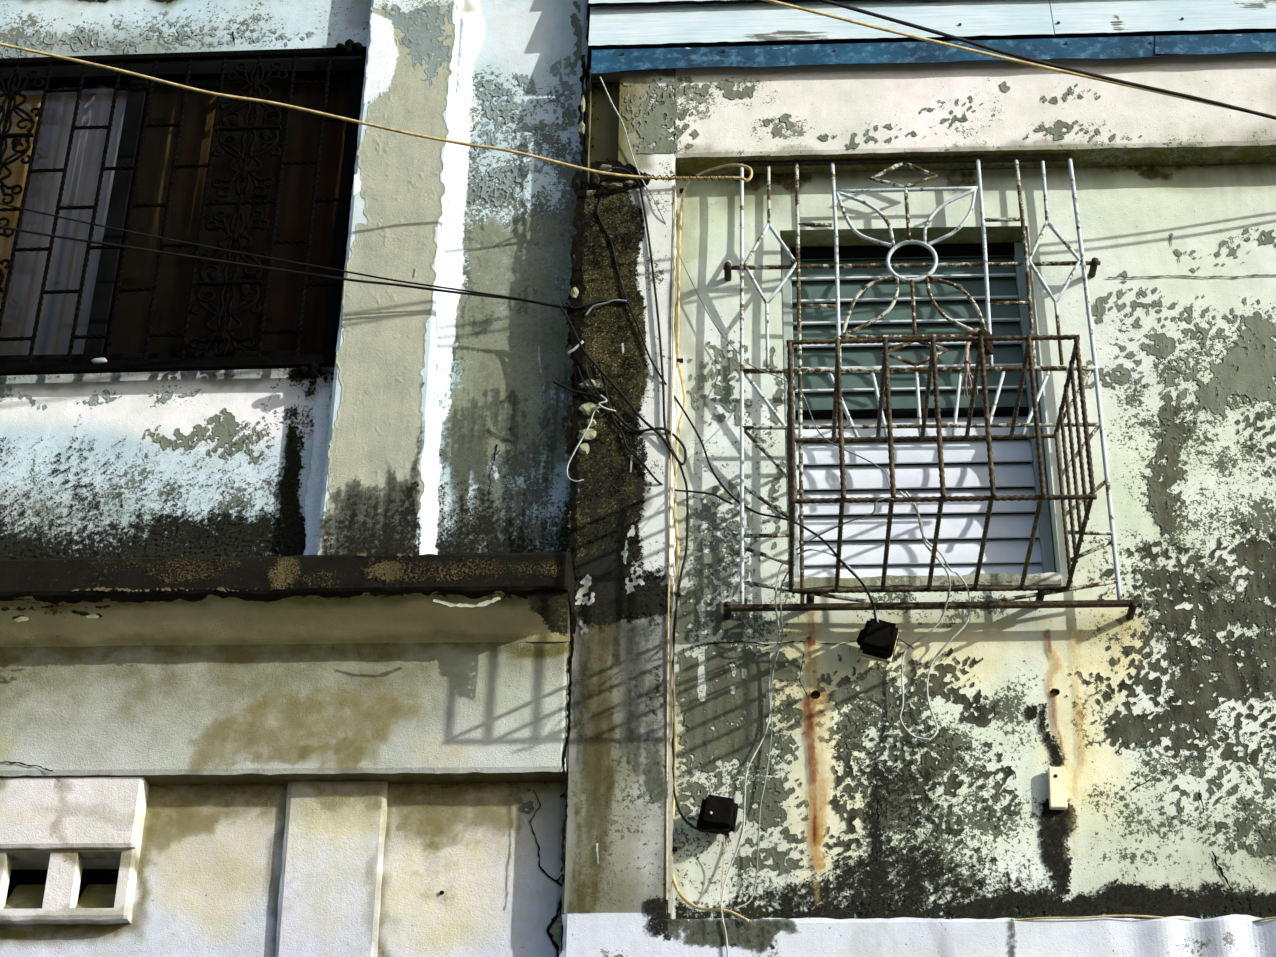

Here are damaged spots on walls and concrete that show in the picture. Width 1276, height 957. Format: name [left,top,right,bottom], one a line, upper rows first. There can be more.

peeling [466,1,756,227]
peeling [317,1,455,555]
peeling [143,408,272,464]
water stain [0,189,668,913]
crack [488,444,500,496]
crack [529,55,587,957]
corrosion [806,636,816,672]
corrosion [804,690,829,869]
mould [644,732,1276,957]
water stain [1023,703,1067,767]
corrosion [1045,630,1062,748]
peeling [1050,270,1276,857]